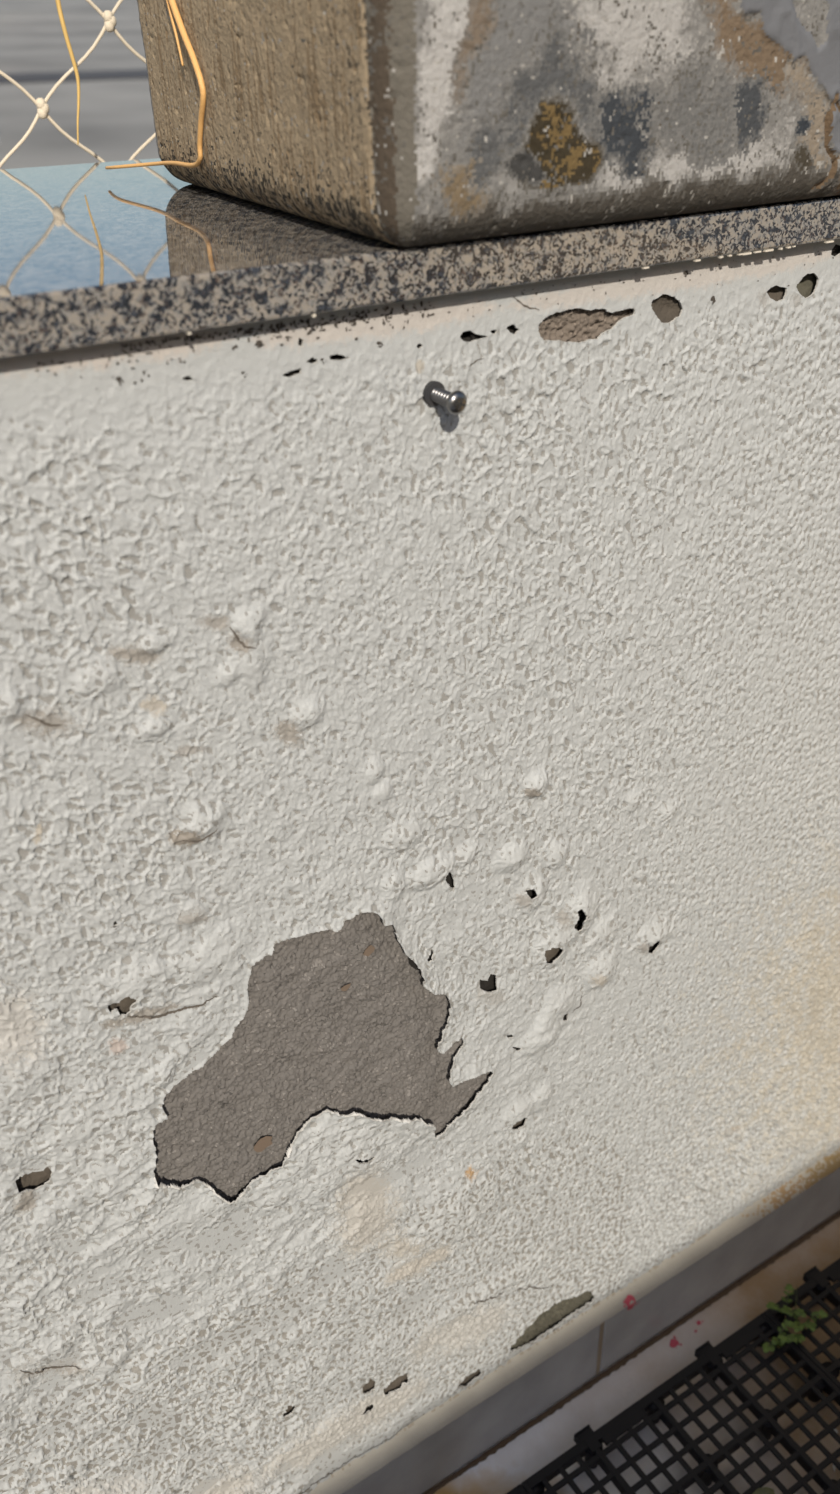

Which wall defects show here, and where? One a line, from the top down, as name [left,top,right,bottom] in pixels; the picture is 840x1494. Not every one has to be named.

spalling [539,308,635,343]
peeling [153,912,494,1204]
spalling [510,1291,595,1351]